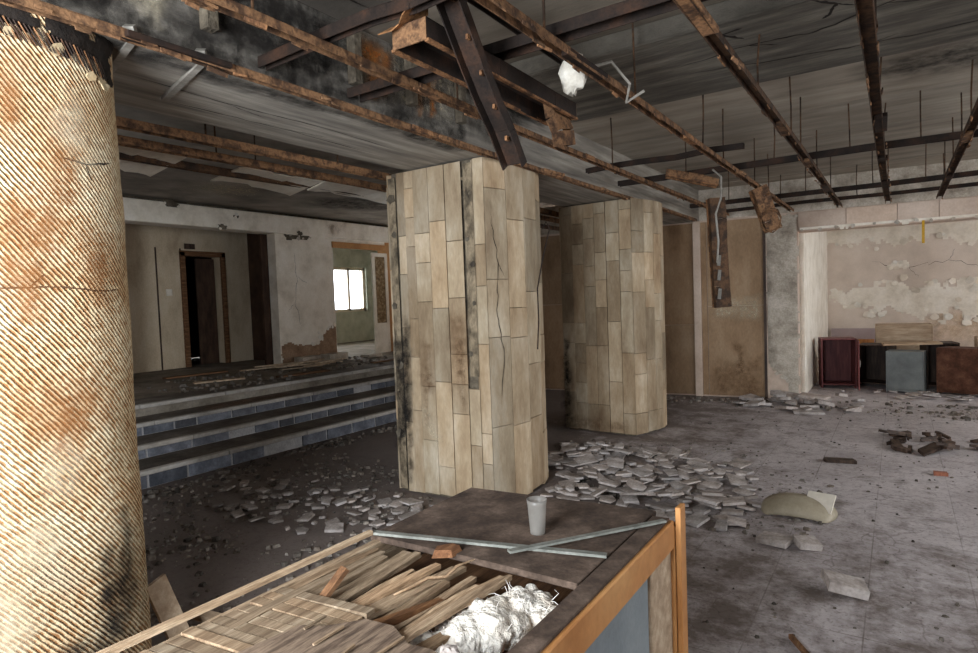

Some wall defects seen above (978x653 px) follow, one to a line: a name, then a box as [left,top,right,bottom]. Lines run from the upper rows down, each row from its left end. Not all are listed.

spalling [0,4,113,91]
leakage [218,12,291,53]
leakage [240,0,327,33]
peeling [281,322,337,363]